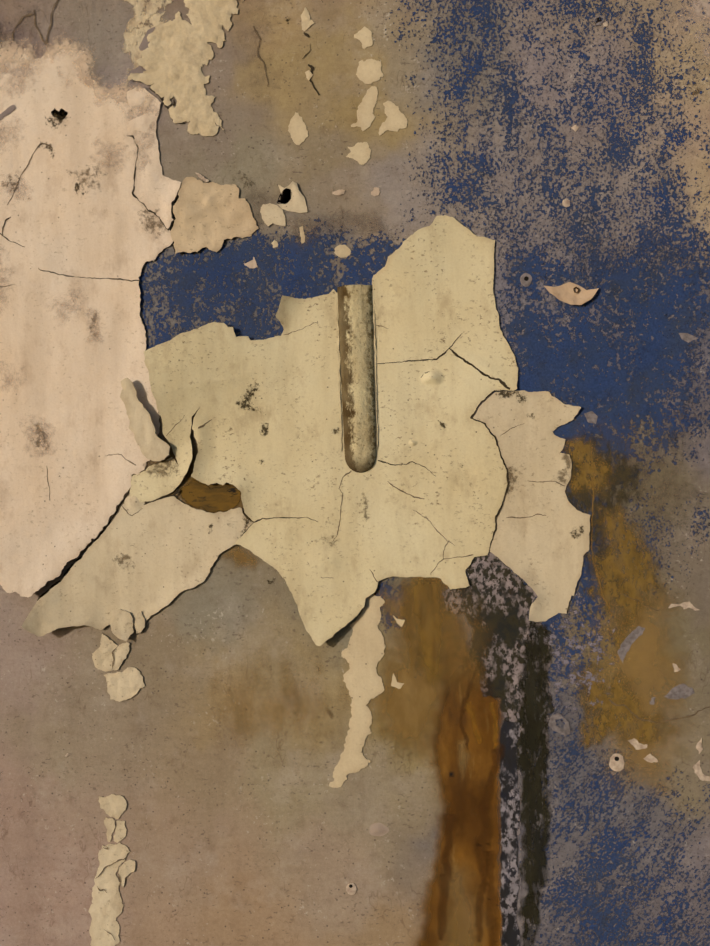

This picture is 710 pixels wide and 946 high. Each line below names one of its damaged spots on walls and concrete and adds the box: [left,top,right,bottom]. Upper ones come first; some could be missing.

crack [0,143,53,247]
crack [38,268,139,282]
crack [128,135,182,254]
peeling [260,203,288,229]
crack [377,335,565,575]
leakage [559,439,639,561]
rust [565,439,678,774]
flaking render [668,601,699,611]
peeling [88,794,136,946]
rust [377,577,503,946]
leakage [442,552,620,946]
peeling [530,679,710,946]